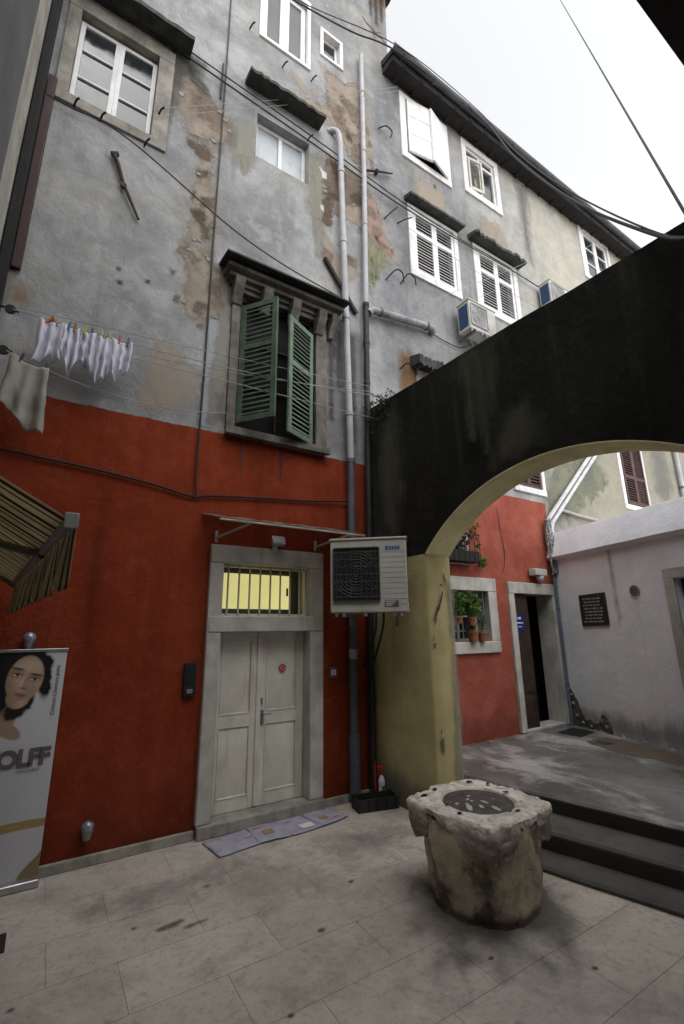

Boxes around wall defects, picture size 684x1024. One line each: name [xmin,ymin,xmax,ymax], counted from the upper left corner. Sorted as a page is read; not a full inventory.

flaking render [172,77,231,329]
flaking render [305,72,394,280]
flaking render [570,689,613,735]